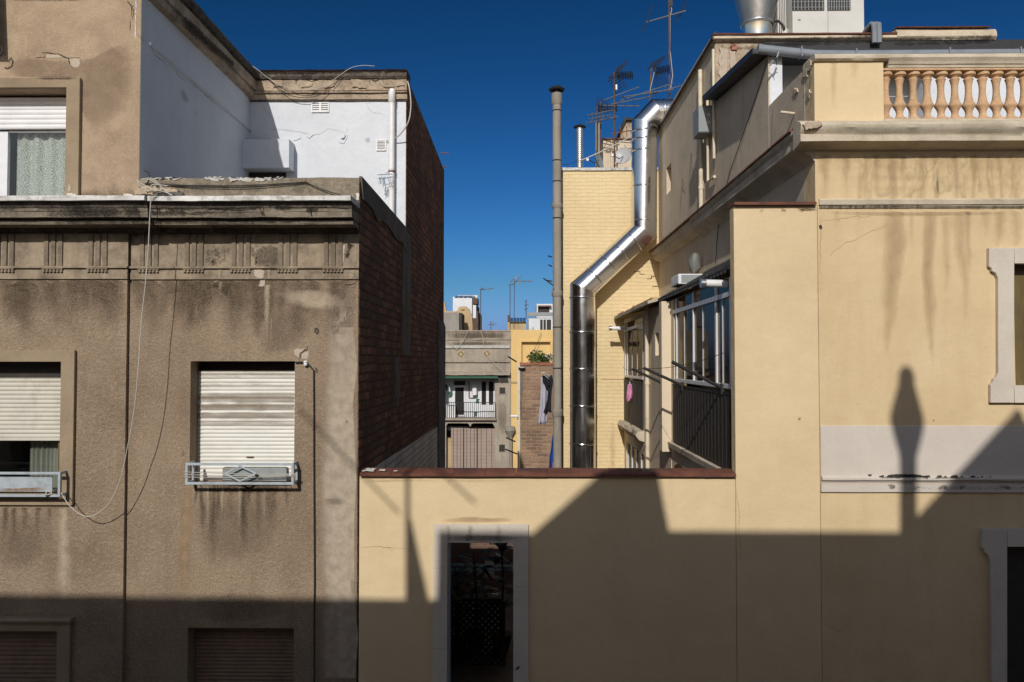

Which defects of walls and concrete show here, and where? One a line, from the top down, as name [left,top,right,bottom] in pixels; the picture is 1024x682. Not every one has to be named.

leakage [800,151,1024,368]
leakage [183,269,401,678]